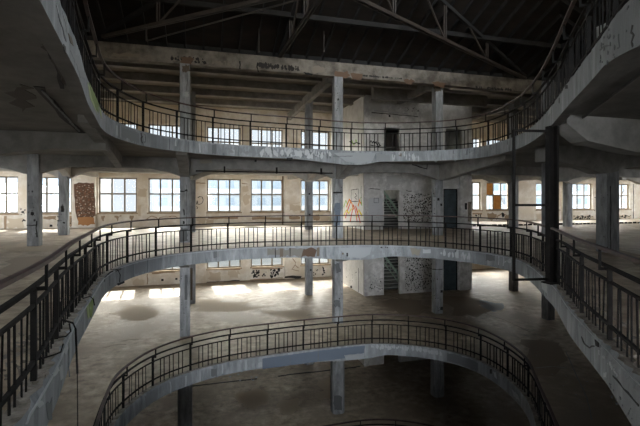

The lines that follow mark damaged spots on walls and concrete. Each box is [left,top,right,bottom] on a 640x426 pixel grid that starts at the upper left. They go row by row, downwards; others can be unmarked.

crack [600,25,635,51]
leakage [109,304,160,321]
crack [612,375,639,407]